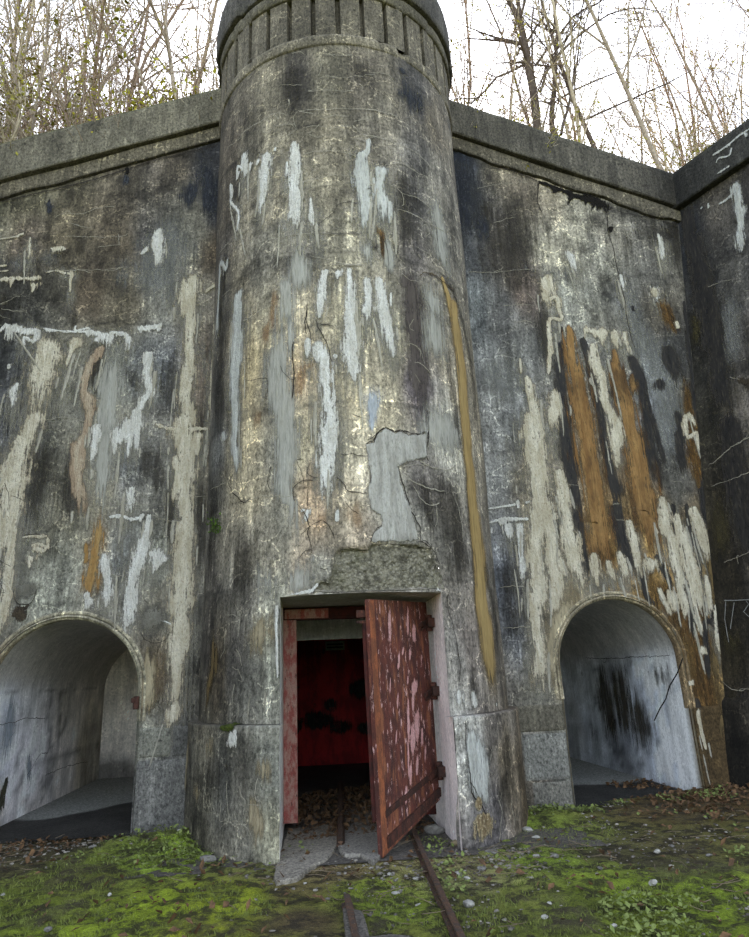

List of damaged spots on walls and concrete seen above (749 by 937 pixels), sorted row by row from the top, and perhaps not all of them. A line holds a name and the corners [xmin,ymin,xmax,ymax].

crack [246,305,333,398]
rust [658,299,677,333]
rust [81,510,108,593]
crack [195,410,463,575]
spalling [312,427,444,593]
rust [441,276,496,685]
rust [560,325,616,574]
rust [607,349,724,736]
damp [596,661,657,746]